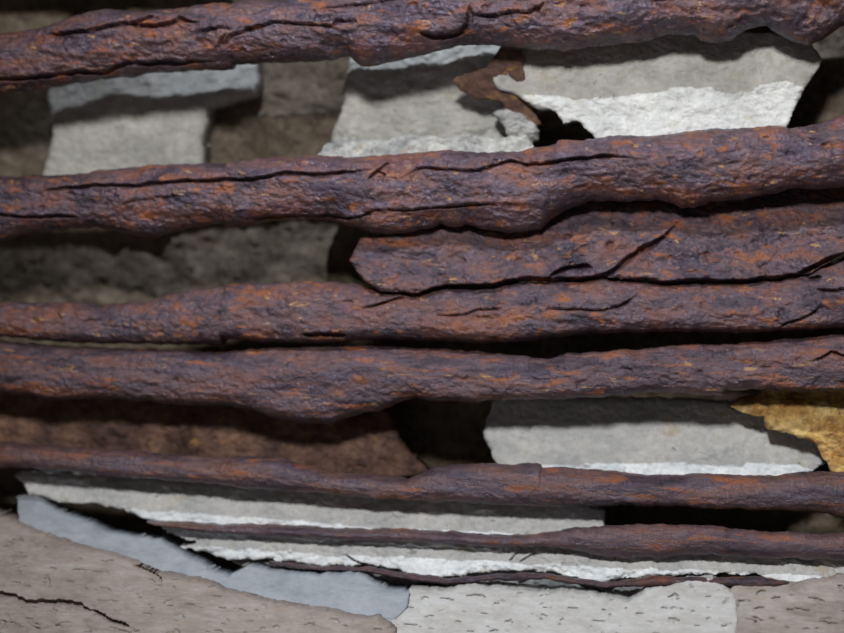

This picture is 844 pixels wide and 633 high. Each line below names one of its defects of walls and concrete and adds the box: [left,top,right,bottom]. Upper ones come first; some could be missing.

rust [729,390,844,472]